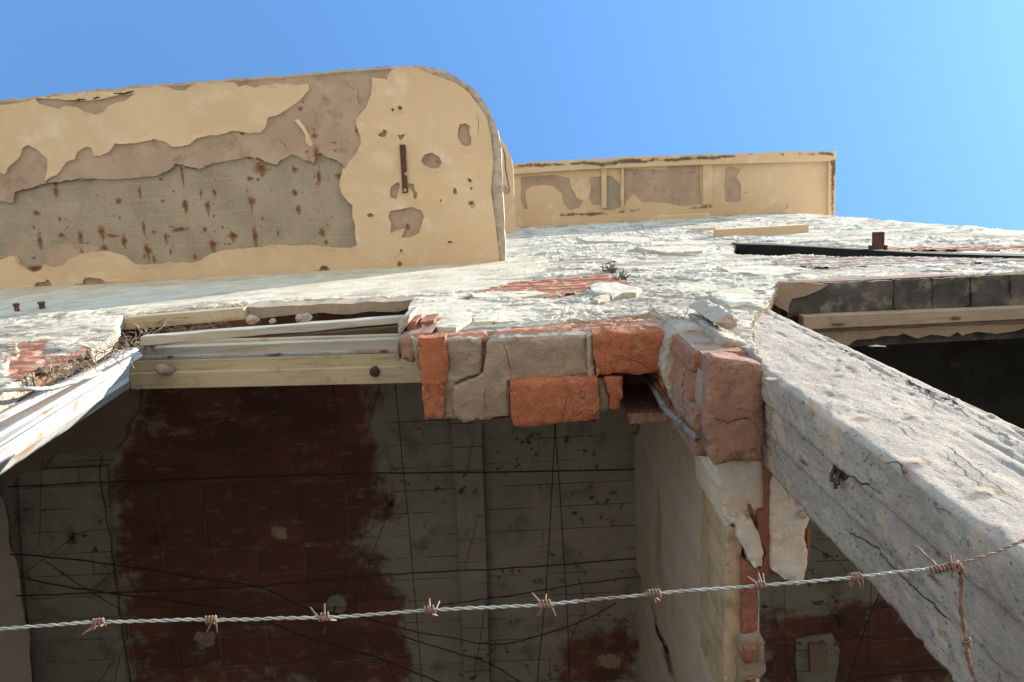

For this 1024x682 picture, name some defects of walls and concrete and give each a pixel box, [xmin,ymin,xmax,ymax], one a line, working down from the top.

rust [28,210,42,271]
rust [98,226,127,251]
rust [142,179,238,264]
spalling [0,66,394,286]
rust [247,162,269,247]
peeling [389,182,424,252]
peeling [414,65,709,260]
peeling [724,166,741,203]
crack [816,341,1018,437]
crack [901,421,1021,502]
crack [848,531,954,624]
water stain [193,631,216,650]